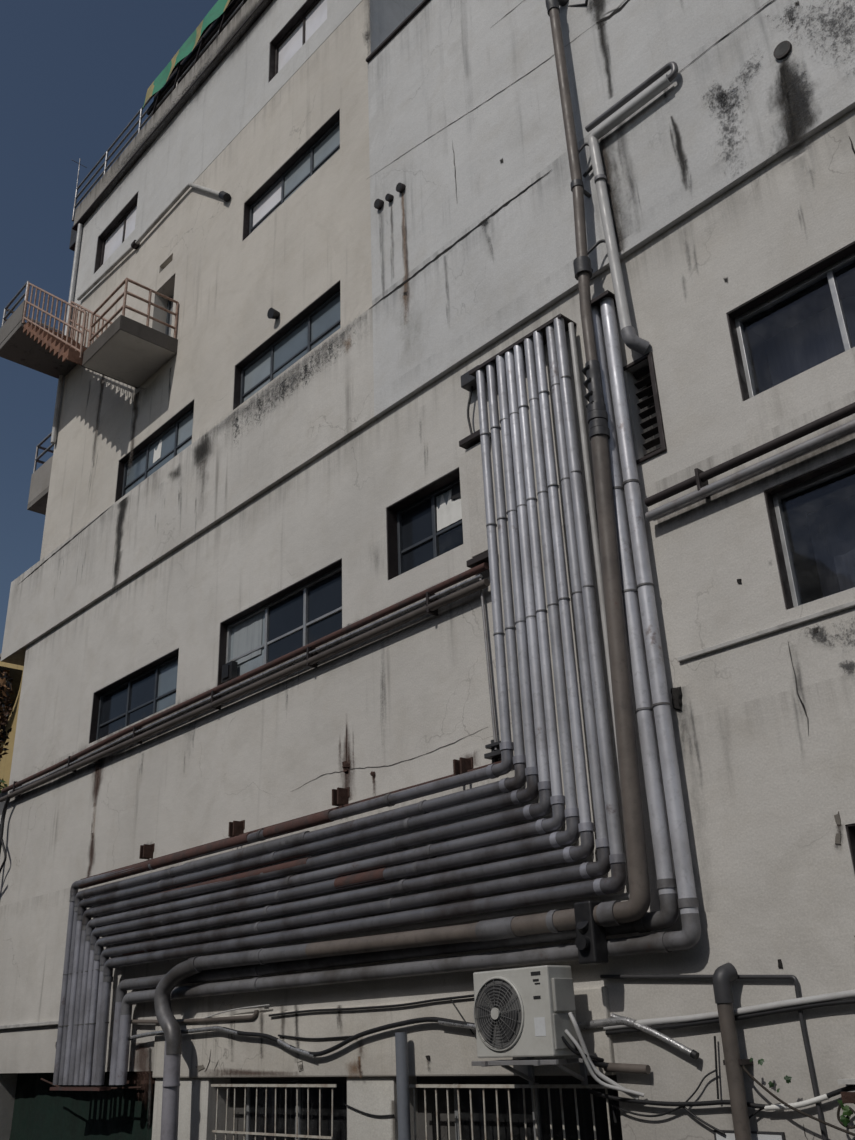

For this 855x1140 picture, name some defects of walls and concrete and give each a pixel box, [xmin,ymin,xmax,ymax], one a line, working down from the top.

damp [589,0,612,95]
damp [780,1,855,51]
damp [671,116,686,182]
damp [703,63,760,162]
damp [777,58,814,151]
damp [234,342,333,435]
damp [195,439,209,463]
damp [114,497,128,583]